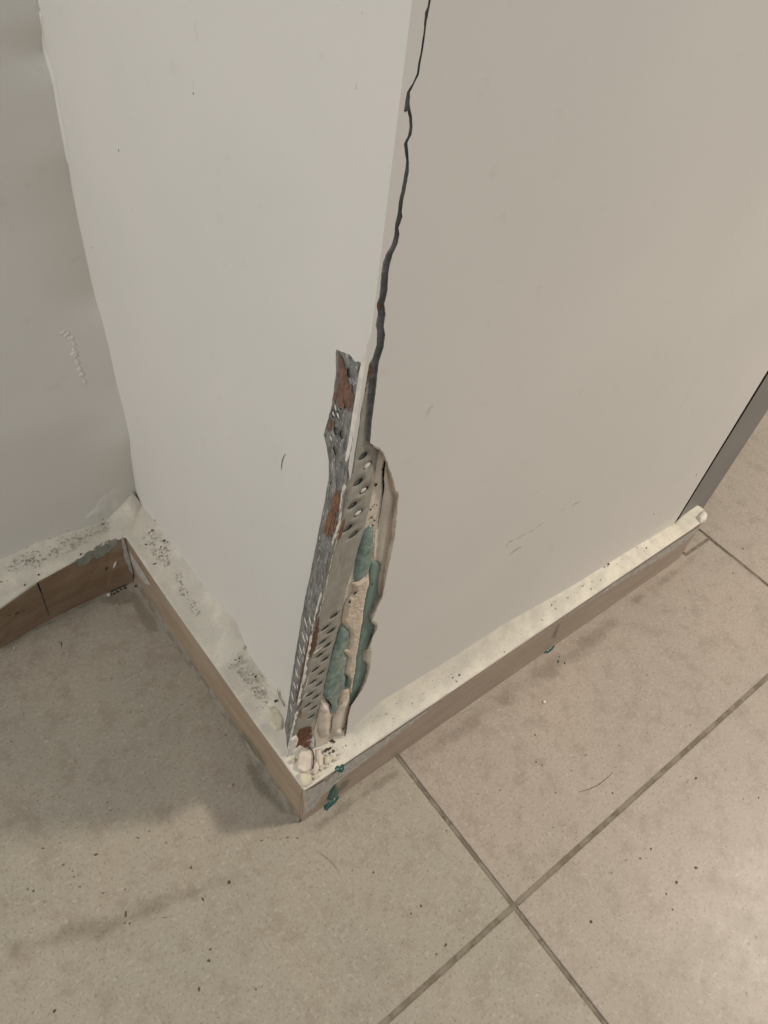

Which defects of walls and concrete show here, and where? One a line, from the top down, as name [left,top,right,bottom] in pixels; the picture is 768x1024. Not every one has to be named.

crack [365,0,431,442]
rust [334,354,354,412]
rust [323,481,348,541]
spalling [286,445,399,757]
rust [295,610,320,748]